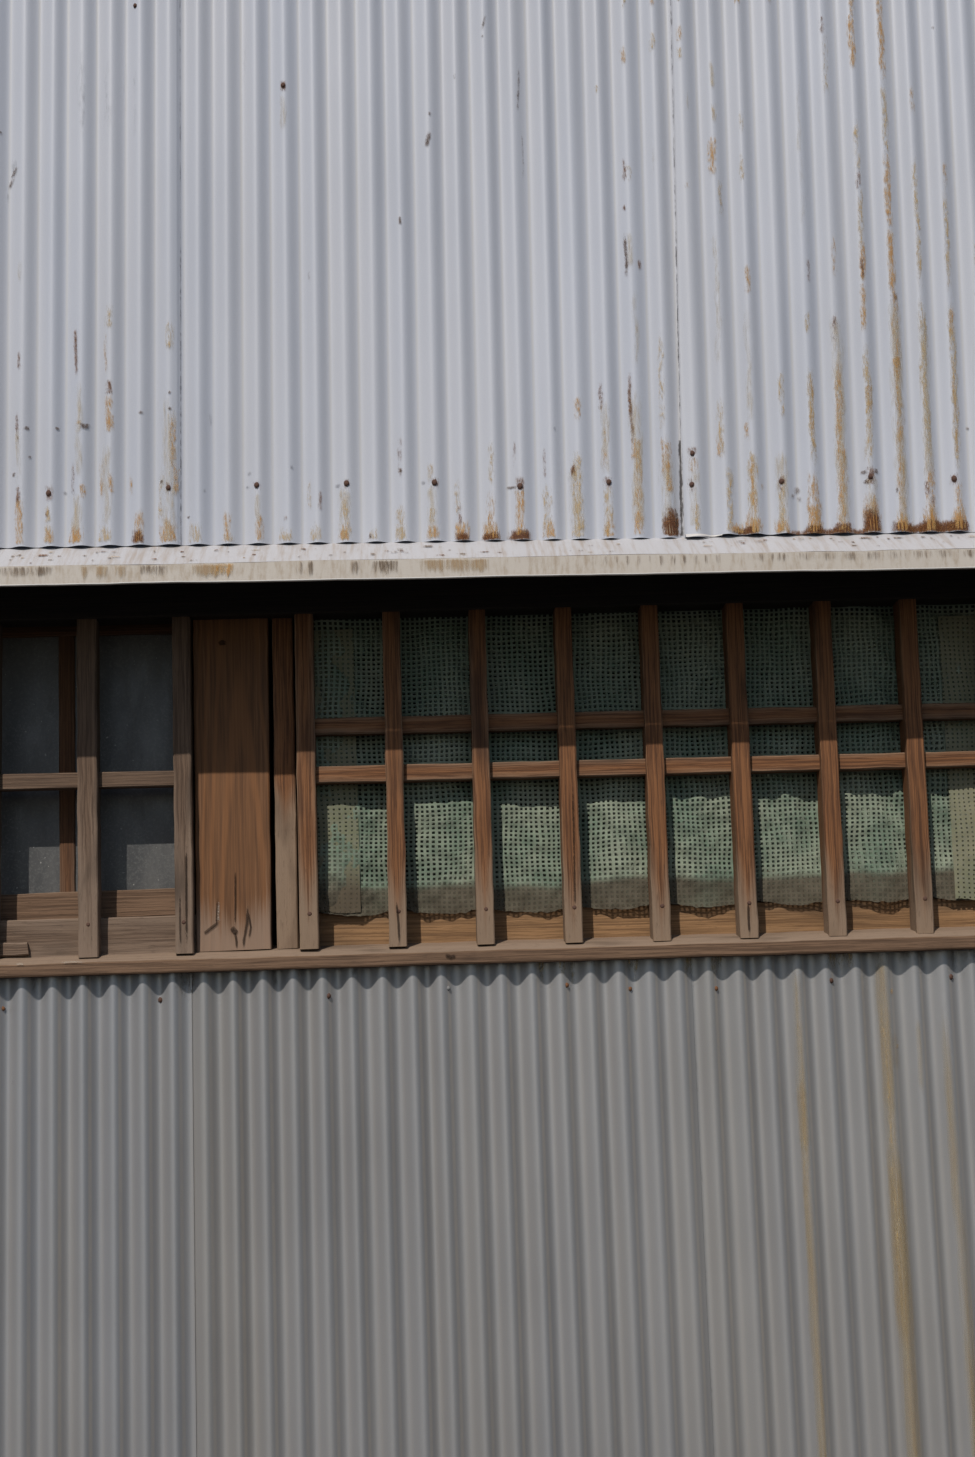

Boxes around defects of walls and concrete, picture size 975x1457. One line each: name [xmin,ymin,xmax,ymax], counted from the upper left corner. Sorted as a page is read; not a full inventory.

corrosion [727,93,969,534]
corrosion [45,478,112,543]
corrosion [455,480,554,540]
damp [196,563,233,576]
damp [426,559,486,570]